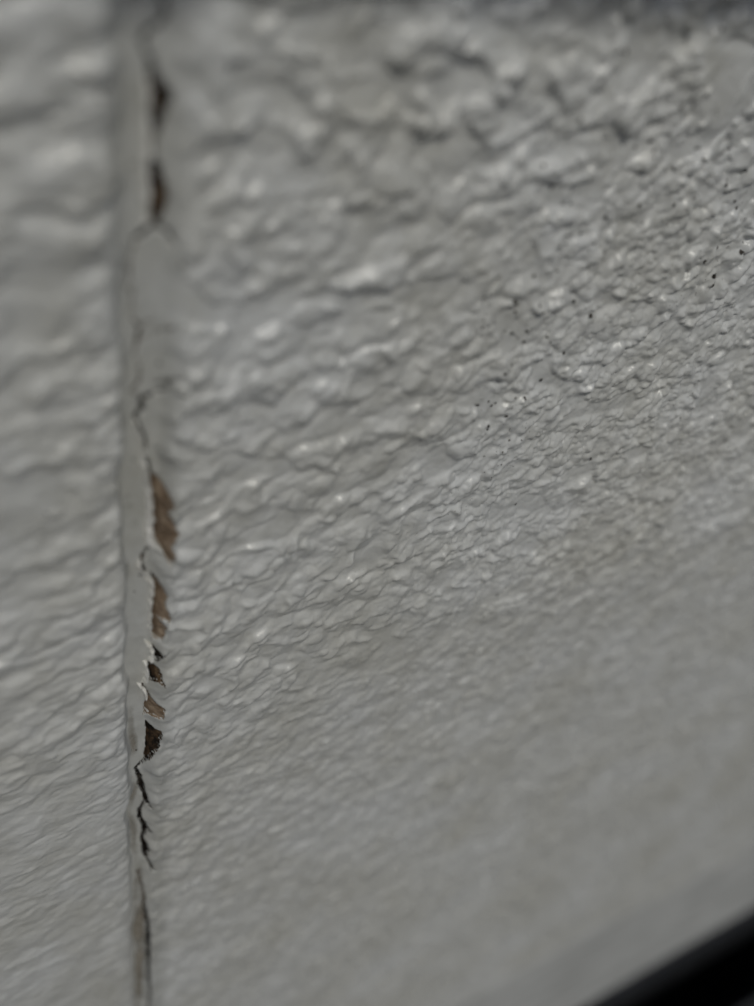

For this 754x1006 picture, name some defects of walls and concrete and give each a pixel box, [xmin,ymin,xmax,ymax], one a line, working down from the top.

crack [132,55,178,247]
crack [133,375,186,477]
crack [137,547,155,582]
peeling [137,468,179,761]